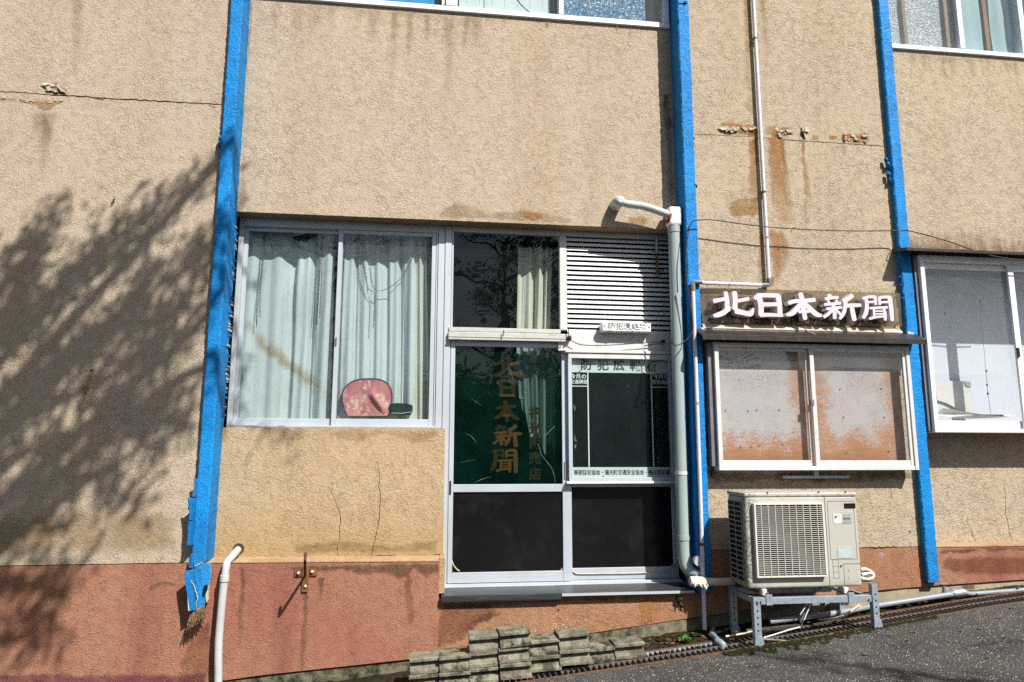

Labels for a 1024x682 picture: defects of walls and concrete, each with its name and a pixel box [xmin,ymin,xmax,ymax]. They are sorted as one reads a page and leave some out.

flaking render [20,82,68,103]
crack [0,91,222,107]
flaking render [718,125,757,134]
corrosion [722,123,757,168]
corrosion [769,127,787,183]
flaking render [842,131,870,144]
crack [371,461,381,554]
peeling [184,479,211,611]